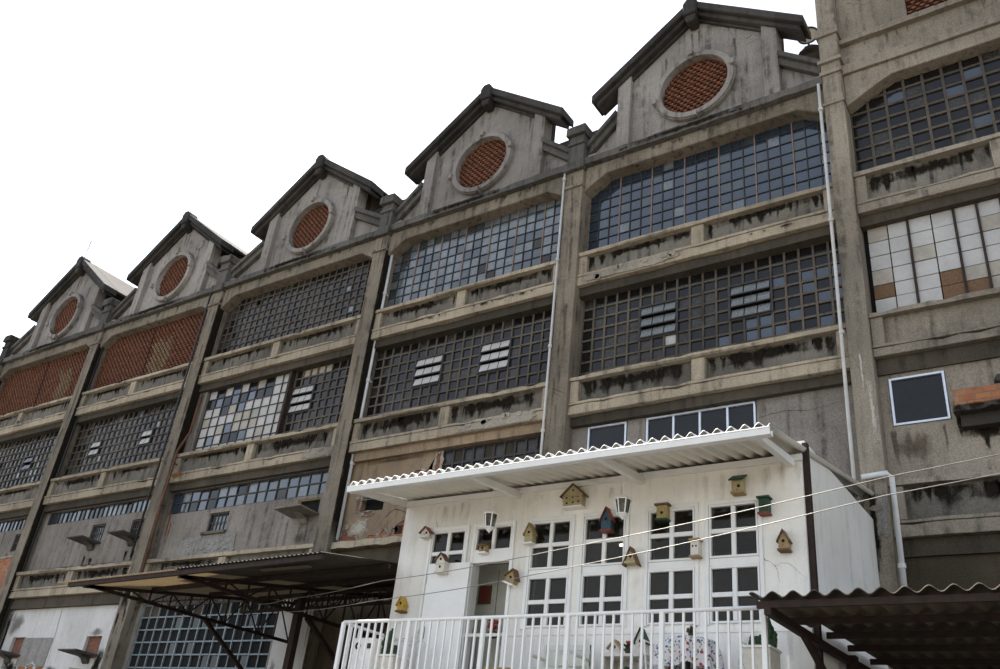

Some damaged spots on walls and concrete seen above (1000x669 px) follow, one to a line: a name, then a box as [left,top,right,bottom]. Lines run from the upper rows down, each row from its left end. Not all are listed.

water stain [869,146,990,191]
water stain [708,336,835,370]
water stain [583,365,682,396]
flaking render [338,519,405,542]